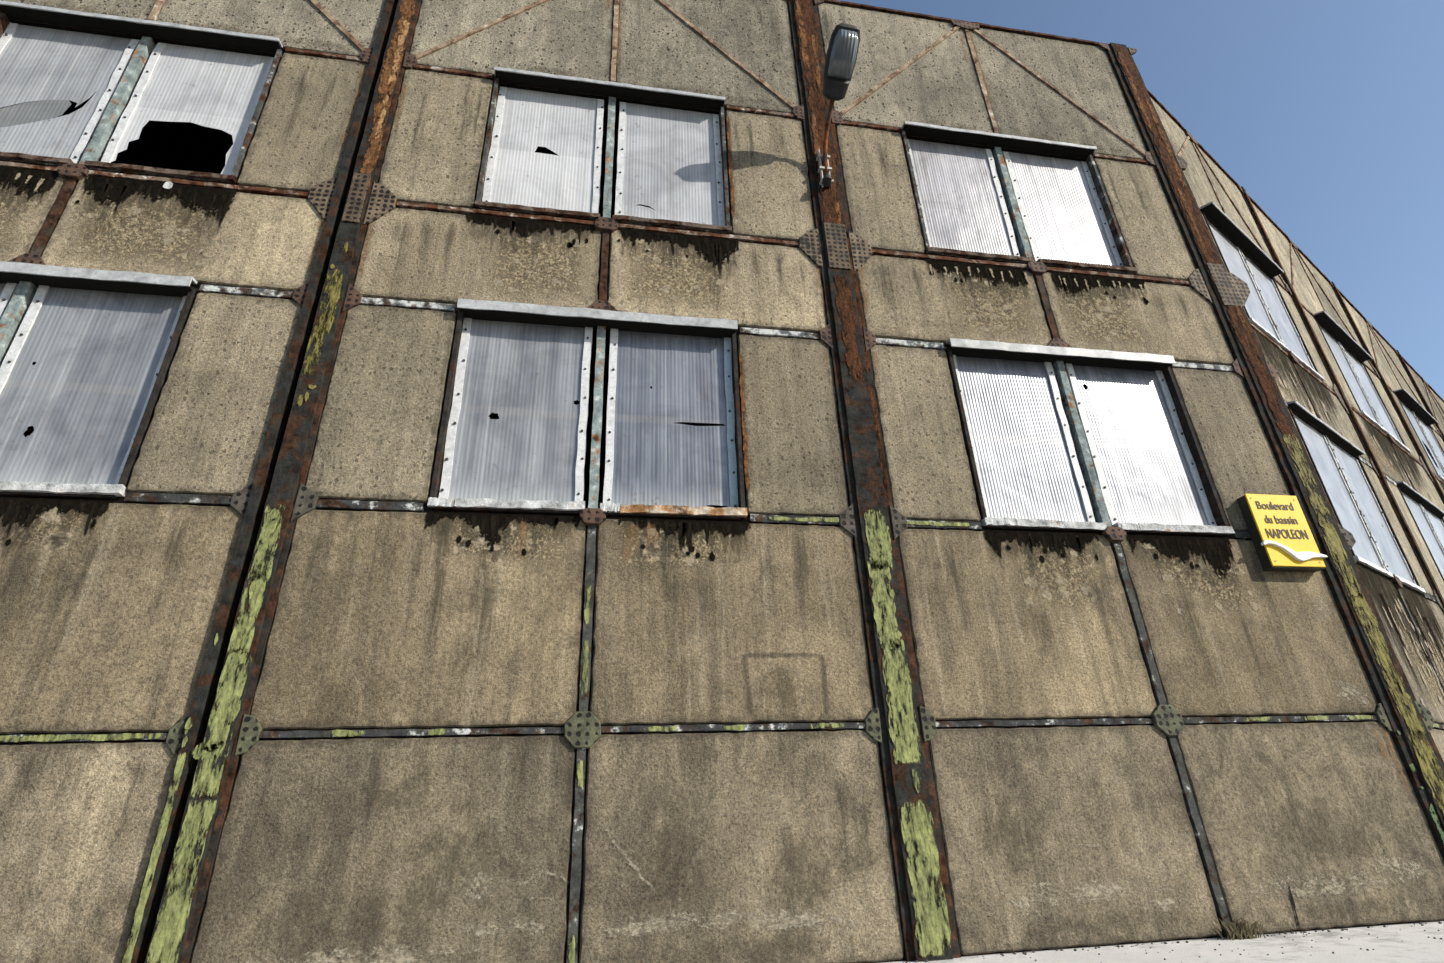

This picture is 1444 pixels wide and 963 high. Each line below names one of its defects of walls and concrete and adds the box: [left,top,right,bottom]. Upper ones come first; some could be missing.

corrosion [352,0,415,186]
damp [0,167,59,213]
damp [75,175,238,236]
damp [446,213,596,254]
damp [618,229,739,303]
corrosion [795,0,890,498]
damp [914,259,1029,302]
corrosion [1114,46,1225,284]
corrosion [1225,305,1300,448]
damp [0,498,111,591]
damp [984,530,1099,568]
damp [1127,535,1237,588]